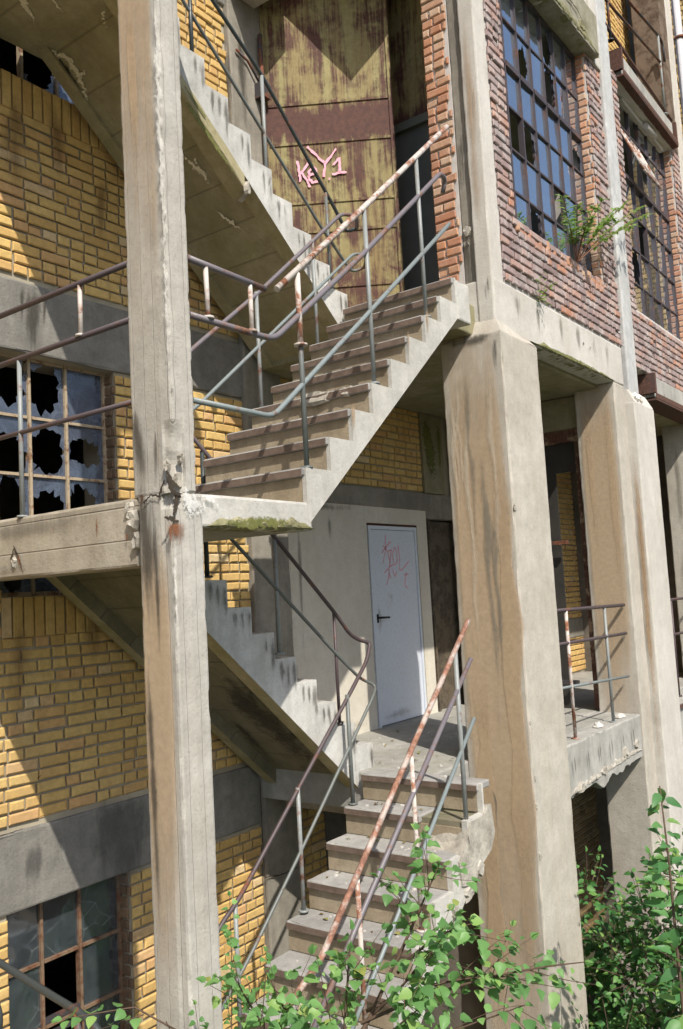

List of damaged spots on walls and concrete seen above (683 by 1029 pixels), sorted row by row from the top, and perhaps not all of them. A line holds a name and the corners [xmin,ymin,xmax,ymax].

damp [464,335,496,359]
crack [145,470,182,523]
damp [226,671,299,753]
damp [266,643,336,717]
damp [454,392,536,979]
spalling [419,803,495,918]